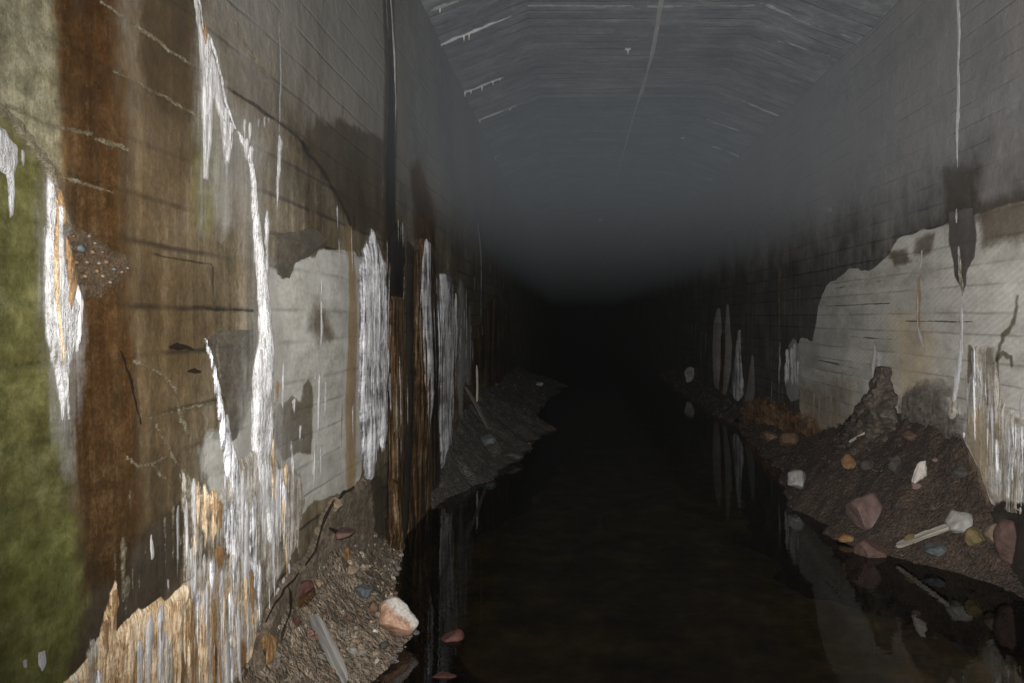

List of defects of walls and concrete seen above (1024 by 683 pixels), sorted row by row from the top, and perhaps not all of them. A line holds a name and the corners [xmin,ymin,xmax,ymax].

leakage [0,0,84,429]
rust [65,0,120,256]
rust [77,278,135,576]
crack [121,351,213,480]
efflorescence [64,0,327,683]
peeling [169,330,256,509]
peeling [252,228,376,671]
leakage [358,220,405,539]
efflorescence [436,226,483,468]
peeling [798,201,1024,506]
leakage [948,208,1024,587]
efflorescence [23,651,46,672]